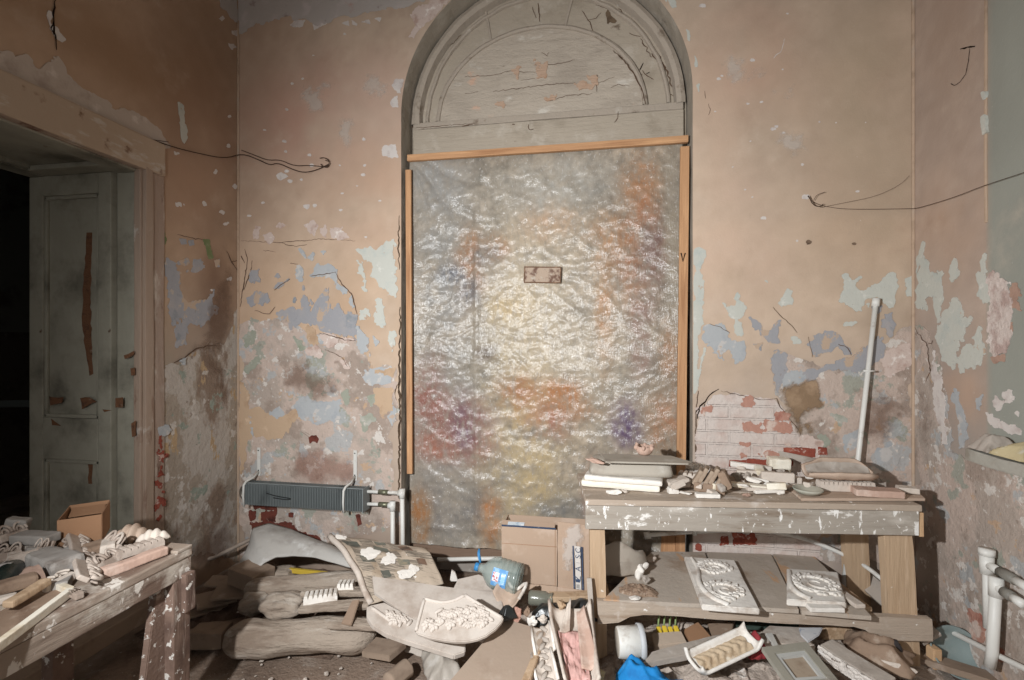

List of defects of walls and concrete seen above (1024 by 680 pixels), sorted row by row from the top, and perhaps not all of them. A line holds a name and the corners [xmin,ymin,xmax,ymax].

crack [49,0,57,50]
flaking render [0,50,188,155]
crack [465,5,673,104]
peeling [80,397,123,412]
flaking render [154,204,401,563]
crack [696,389,801,435]
water stain [782,380,823,433]
flaking render [693,241,1024,680]